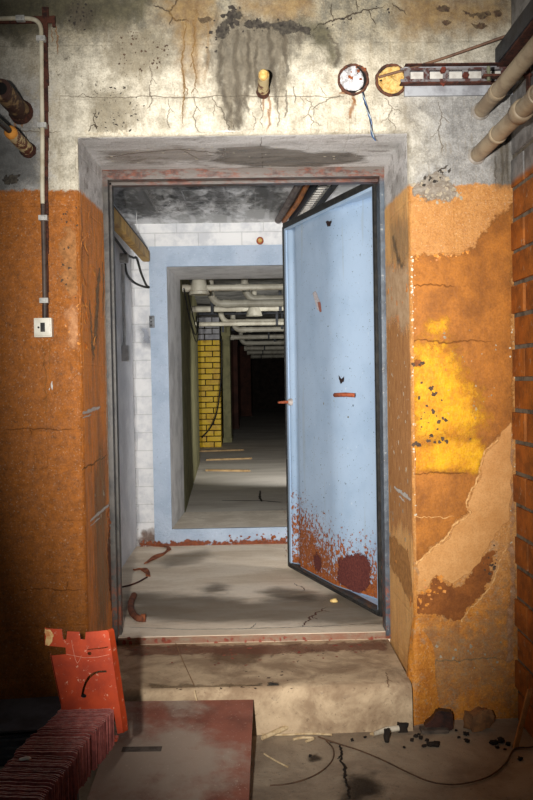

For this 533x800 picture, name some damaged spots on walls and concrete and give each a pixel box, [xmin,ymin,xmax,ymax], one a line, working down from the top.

leakage [207,19,338,127]